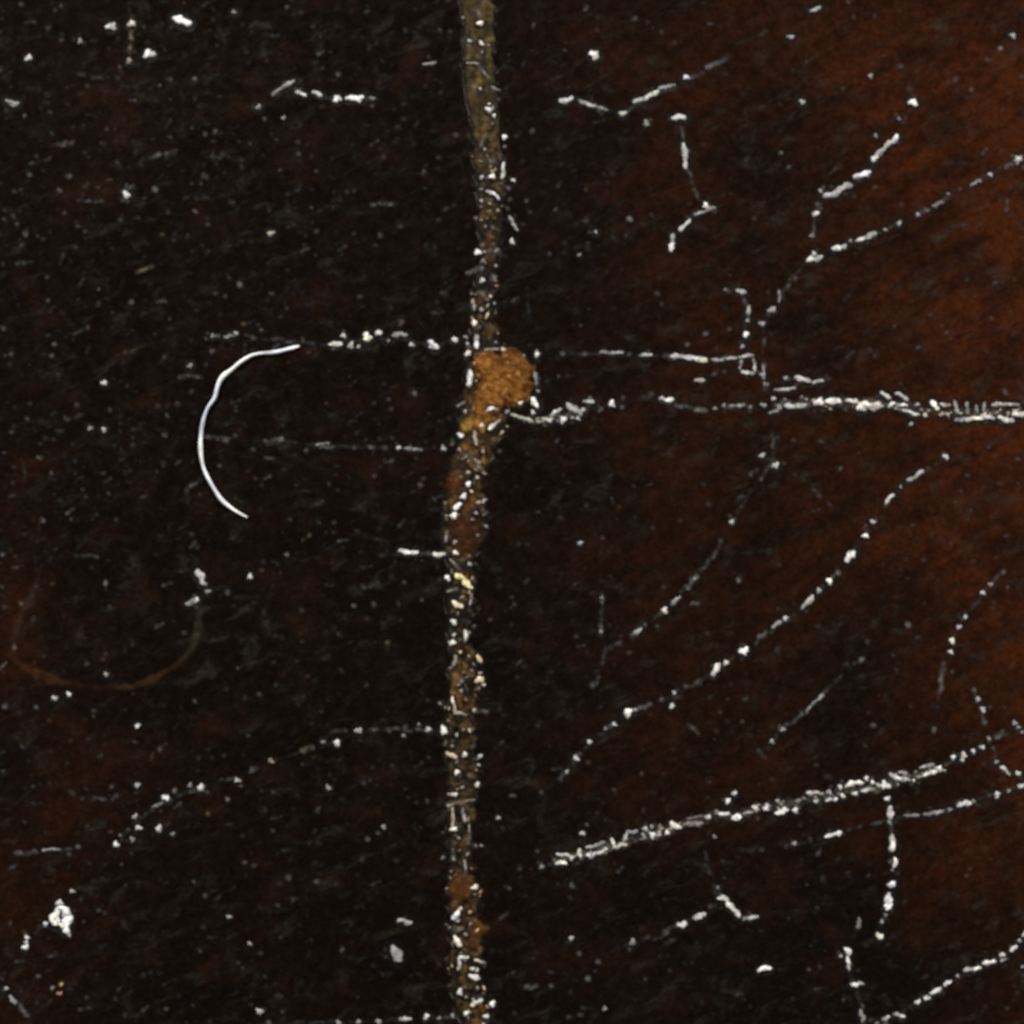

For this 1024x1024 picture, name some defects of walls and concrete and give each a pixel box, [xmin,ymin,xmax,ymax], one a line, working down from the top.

crack [209,331,291,343]
crack [226,0,1024,1024]
crack [111,782,208,851]